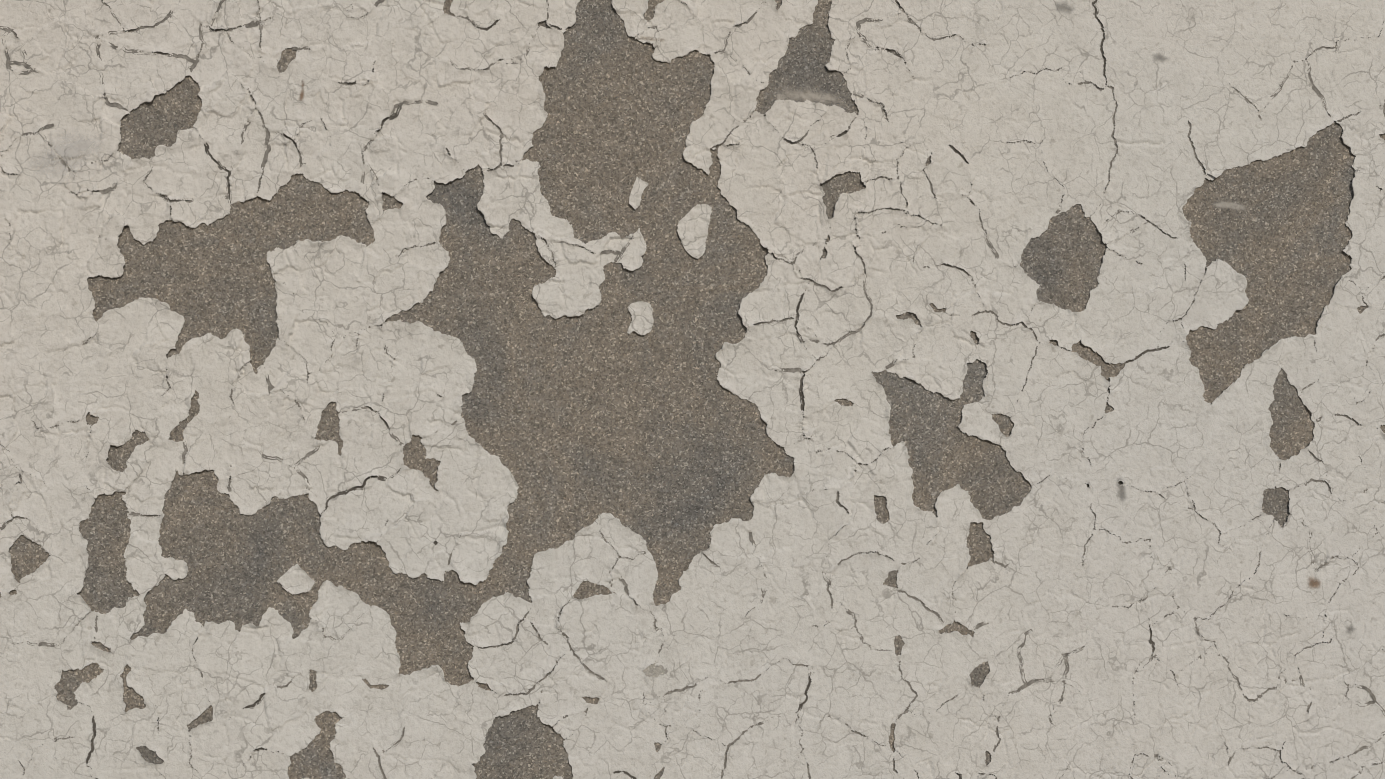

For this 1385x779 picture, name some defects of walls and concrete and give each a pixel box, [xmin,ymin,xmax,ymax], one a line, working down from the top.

crack [227,282,403,511]
peeling [70,0,795,692]
crack [361,100,519,186]
crack [596,0,1084,779]
peeling [872,331,1031,576]
peeling [1014,204,1110,312]
crack [1008,0,1195,465]
crack [1082,342,1385,779]
peeling [1176,121,1359,404]
peeling [1263,368,1315,460]
crack [19,705,98,779]
peeling [465,700,573,779]